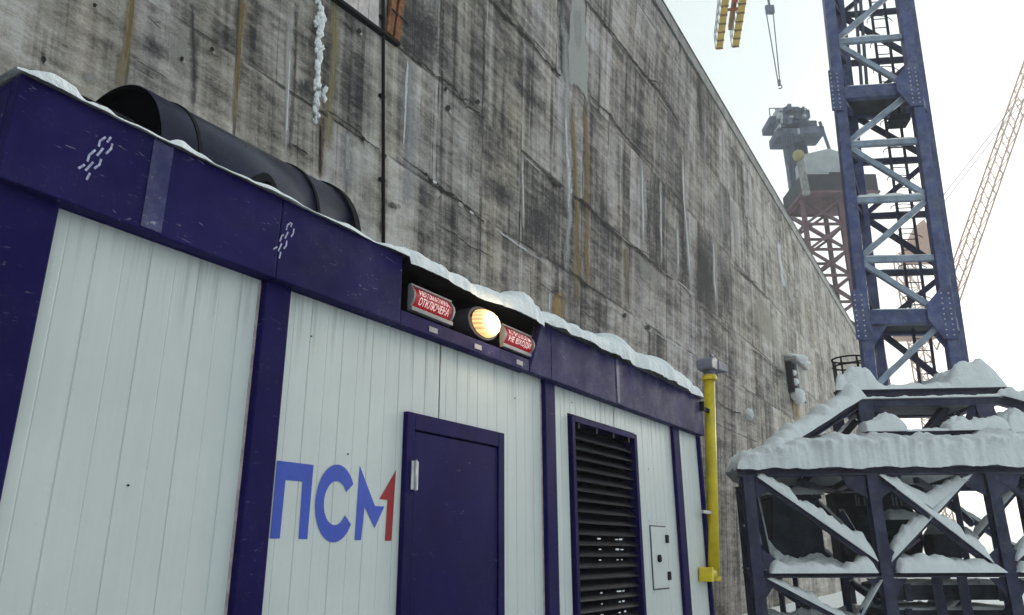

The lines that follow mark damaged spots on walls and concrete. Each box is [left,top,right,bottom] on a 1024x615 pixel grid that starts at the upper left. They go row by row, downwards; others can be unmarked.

corrosion [117,0,135,85]
leakage [402,60,419,200]
leakage [521,157,544,227]
corrosion [570,107,590,295]